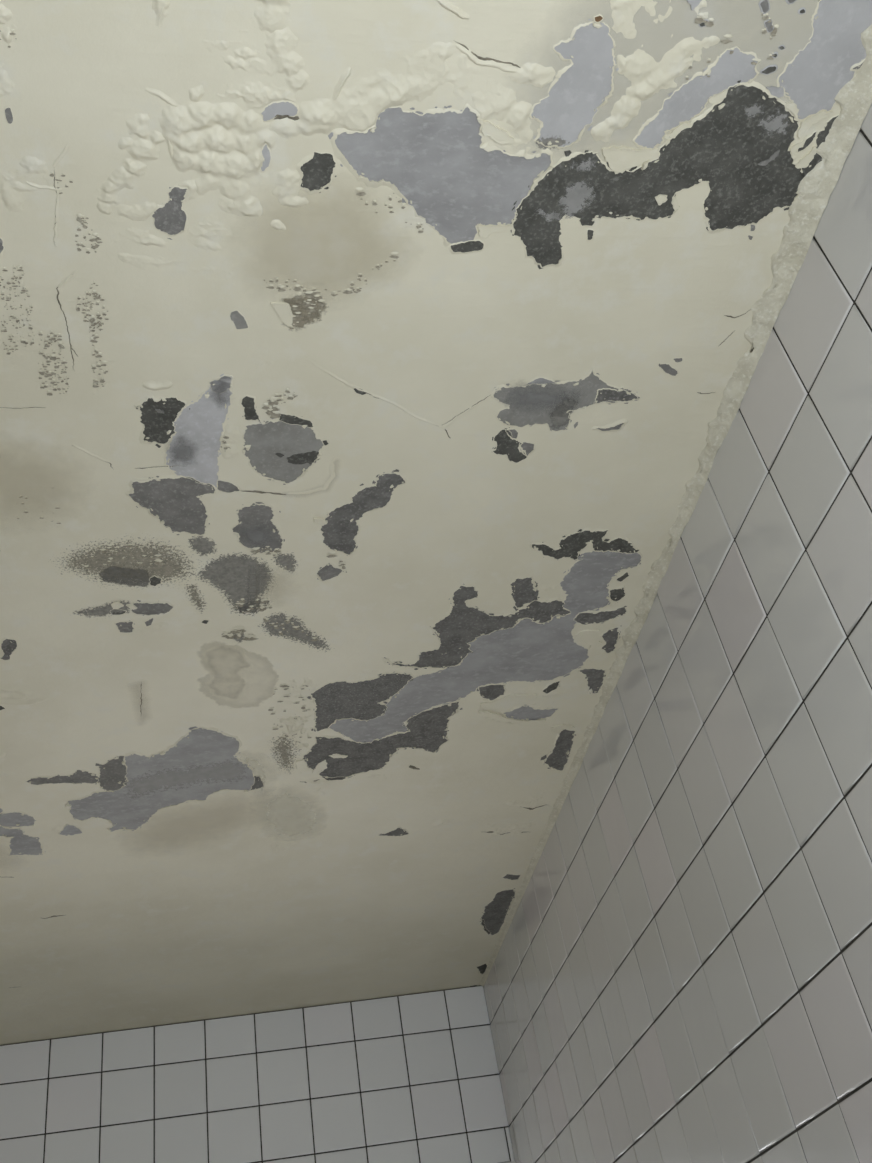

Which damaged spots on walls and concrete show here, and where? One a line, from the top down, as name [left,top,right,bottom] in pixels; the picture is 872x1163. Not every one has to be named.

peeling [4,106,14,124]
spalling [260,0,872,269]
spalling [0,237,70,396]
peeling [229,310,249,330]
peeling [125,374,330,556]
peeling [491,367,641,463]
spalling [314,469,407,582]
damp [53,536,329,650]
spalling [277,528,643,796]
peeling [0,726,264,855]
peeling [480,873,521,935]